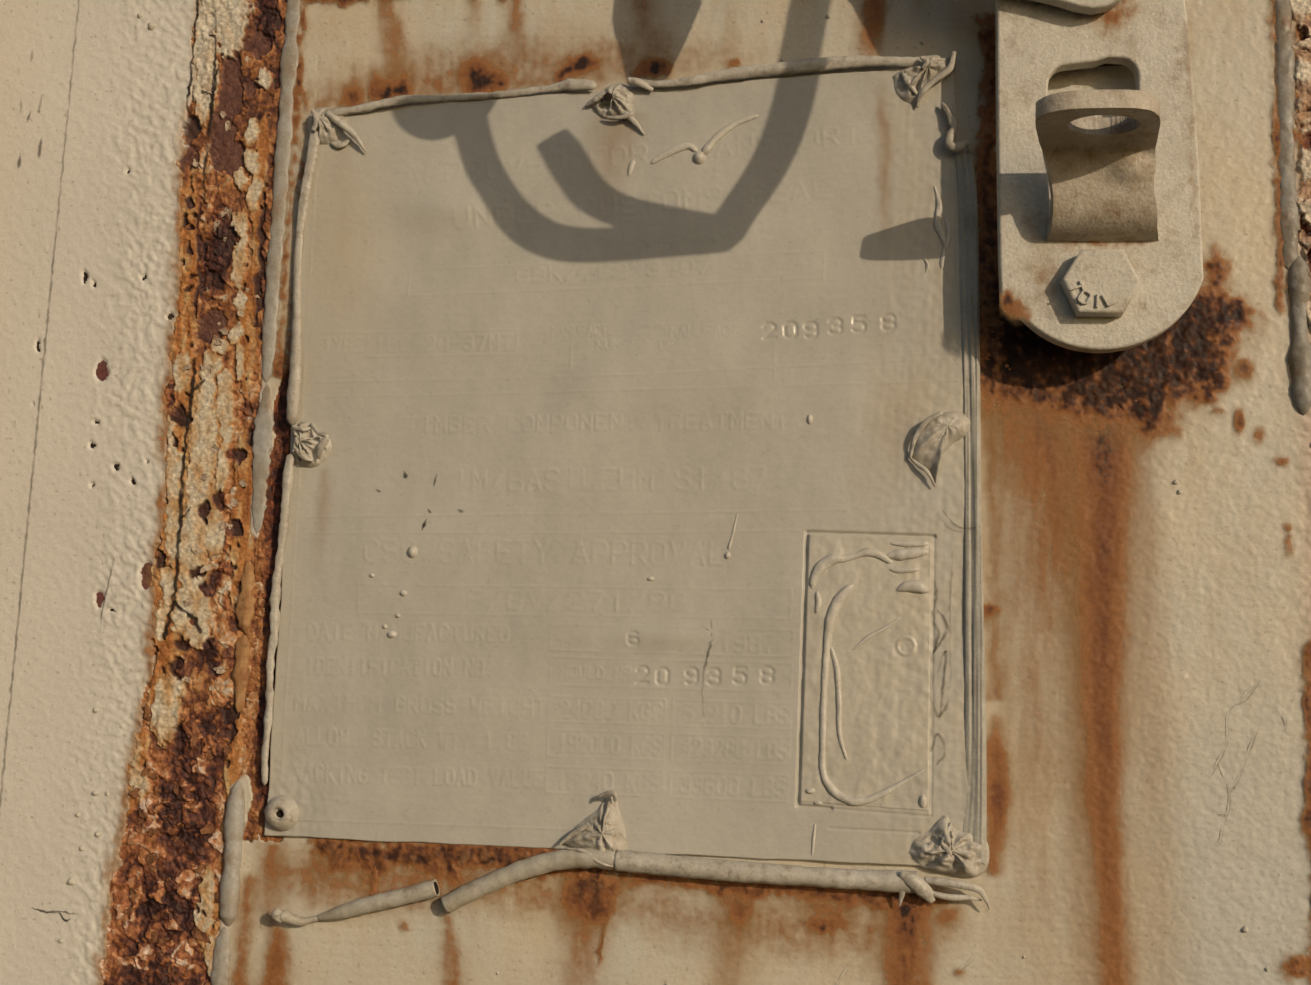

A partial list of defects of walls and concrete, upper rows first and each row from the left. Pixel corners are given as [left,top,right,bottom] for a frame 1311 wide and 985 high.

rust [861,0,886,55]
peeling [1290,0,1311,329]
rust [95,0,673,985]
rust [974,13,1304,985]
rust [1301,639,1311,852]
rust [496,868,959,985]
rust [1282,946,1311,984]